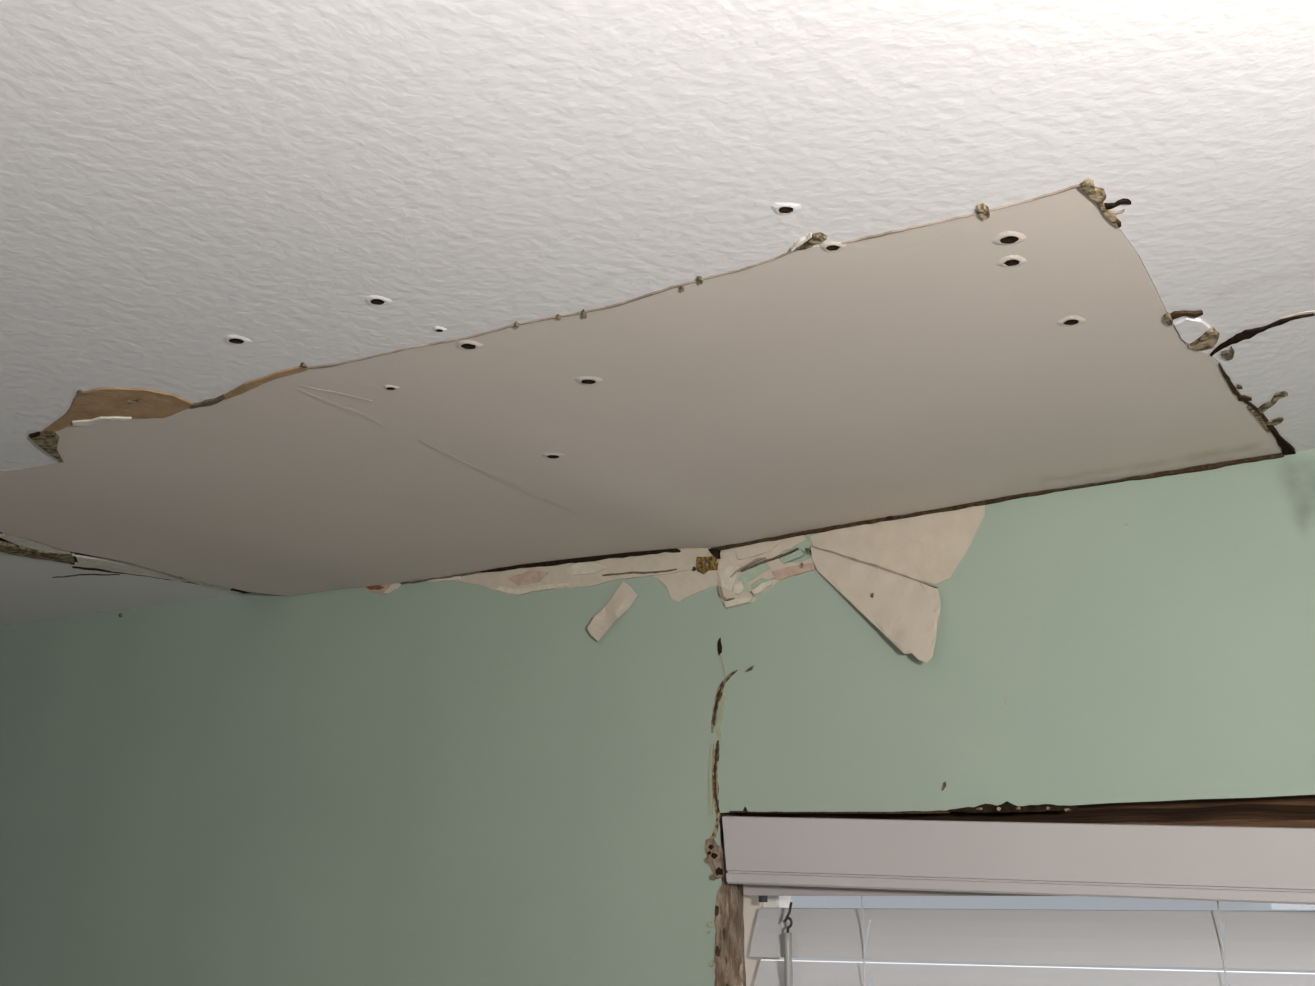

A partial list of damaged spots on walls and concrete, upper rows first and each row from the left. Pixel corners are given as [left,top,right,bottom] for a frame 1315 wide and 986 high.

peeling [977,203,990,220]
spalling [1079,179,1131,228]
spalling [791,232,827,251]
spalling [1163,310,1232,361]
crack [1210,311,1315,455]
crack [0,533,251,593]
peeling [363,583,401,595]
peeling [421,505,985,641]
crack [708,638,950,839]